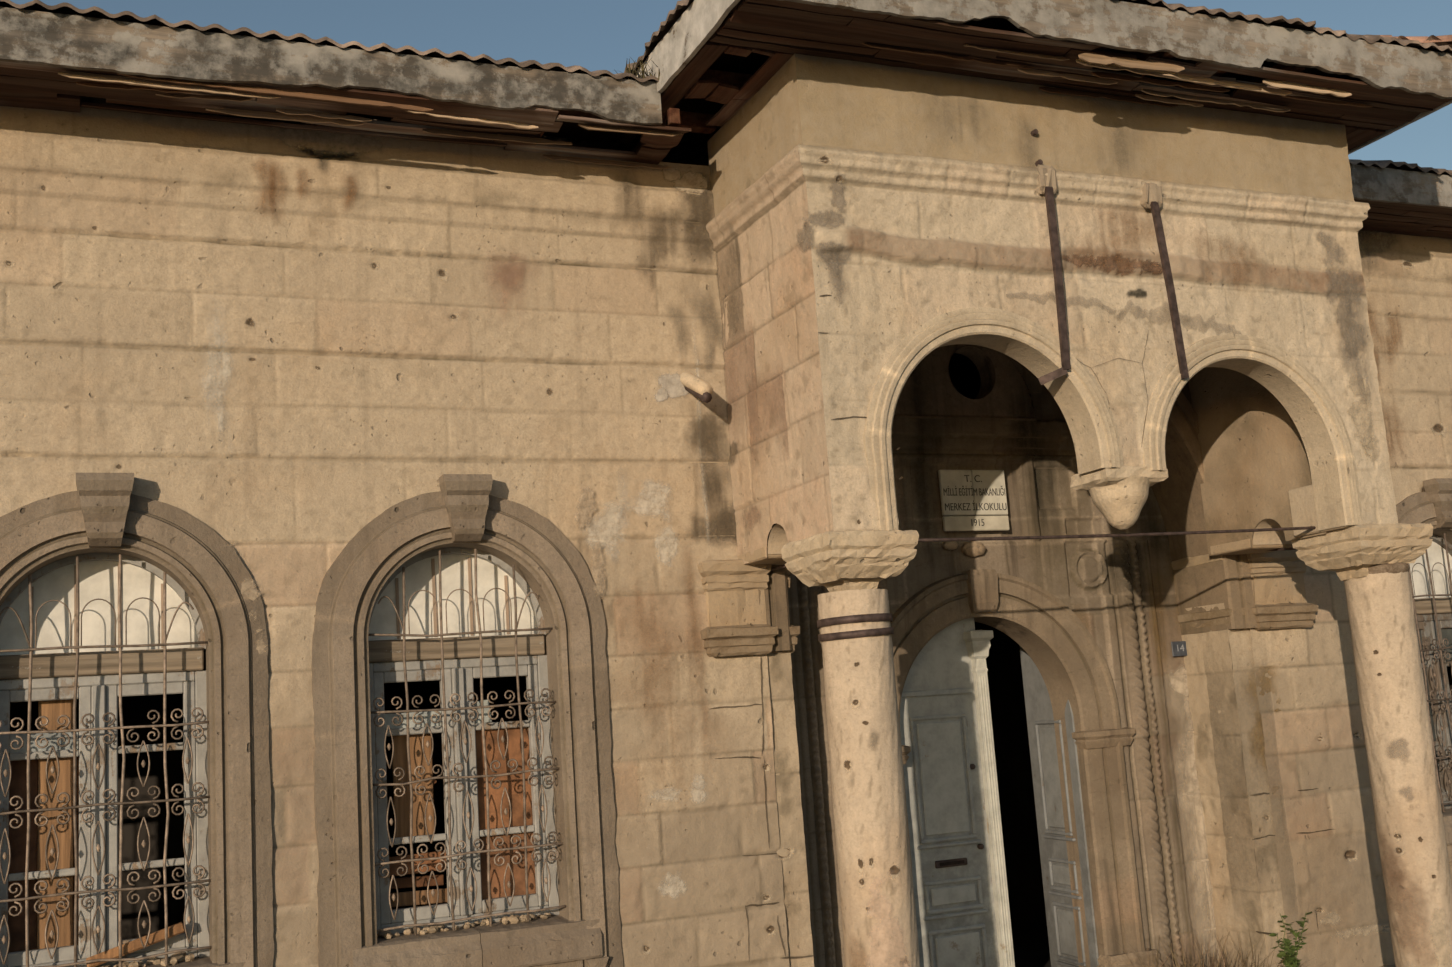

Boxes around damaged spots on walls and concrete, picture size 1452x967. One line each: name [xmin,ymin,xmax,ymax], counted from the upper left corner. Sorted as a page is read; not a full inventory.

damp [301,146,355,159]
damp [650,188,712,258]
damp [693,398,737,541]
peeling [575,481,669,597]